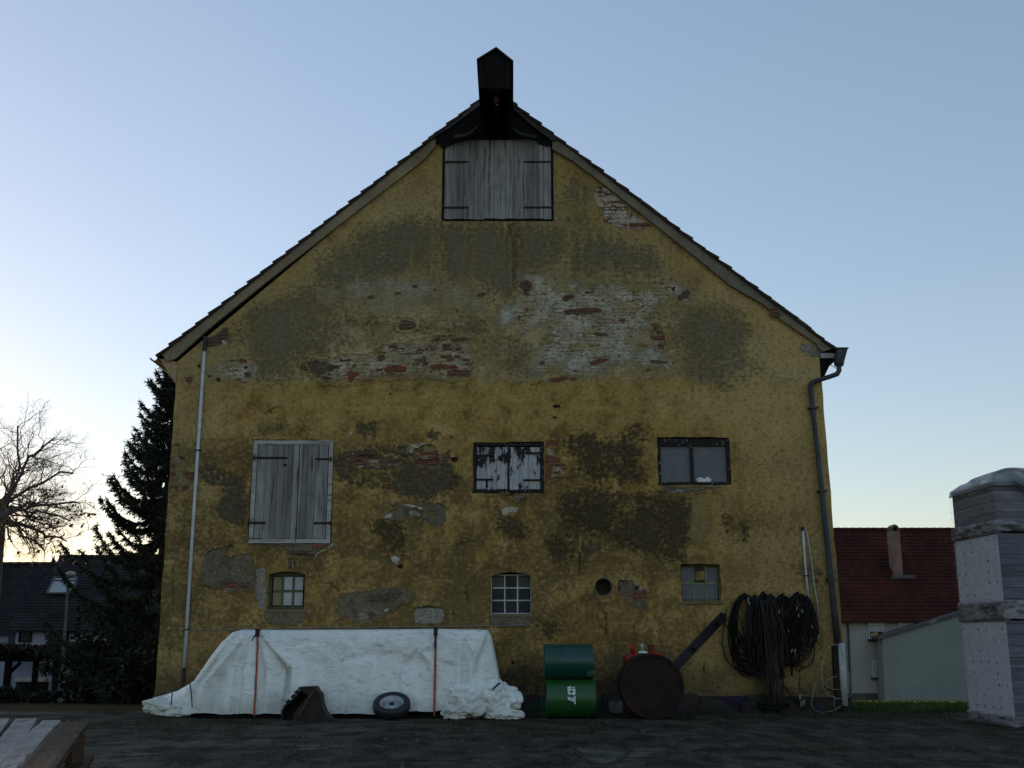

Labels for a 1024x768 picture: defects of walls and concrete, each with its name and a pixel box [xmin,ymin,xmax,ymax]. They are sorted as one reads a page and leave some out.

peeling [592,185,651,230]
spalling [301,314,478,395]
water stain [235,218,563,382]
peeling [493,268,695,386]
water stain [665,303,757,388]
water stain [545,422,692,563]
peeling [334,585,455,629]